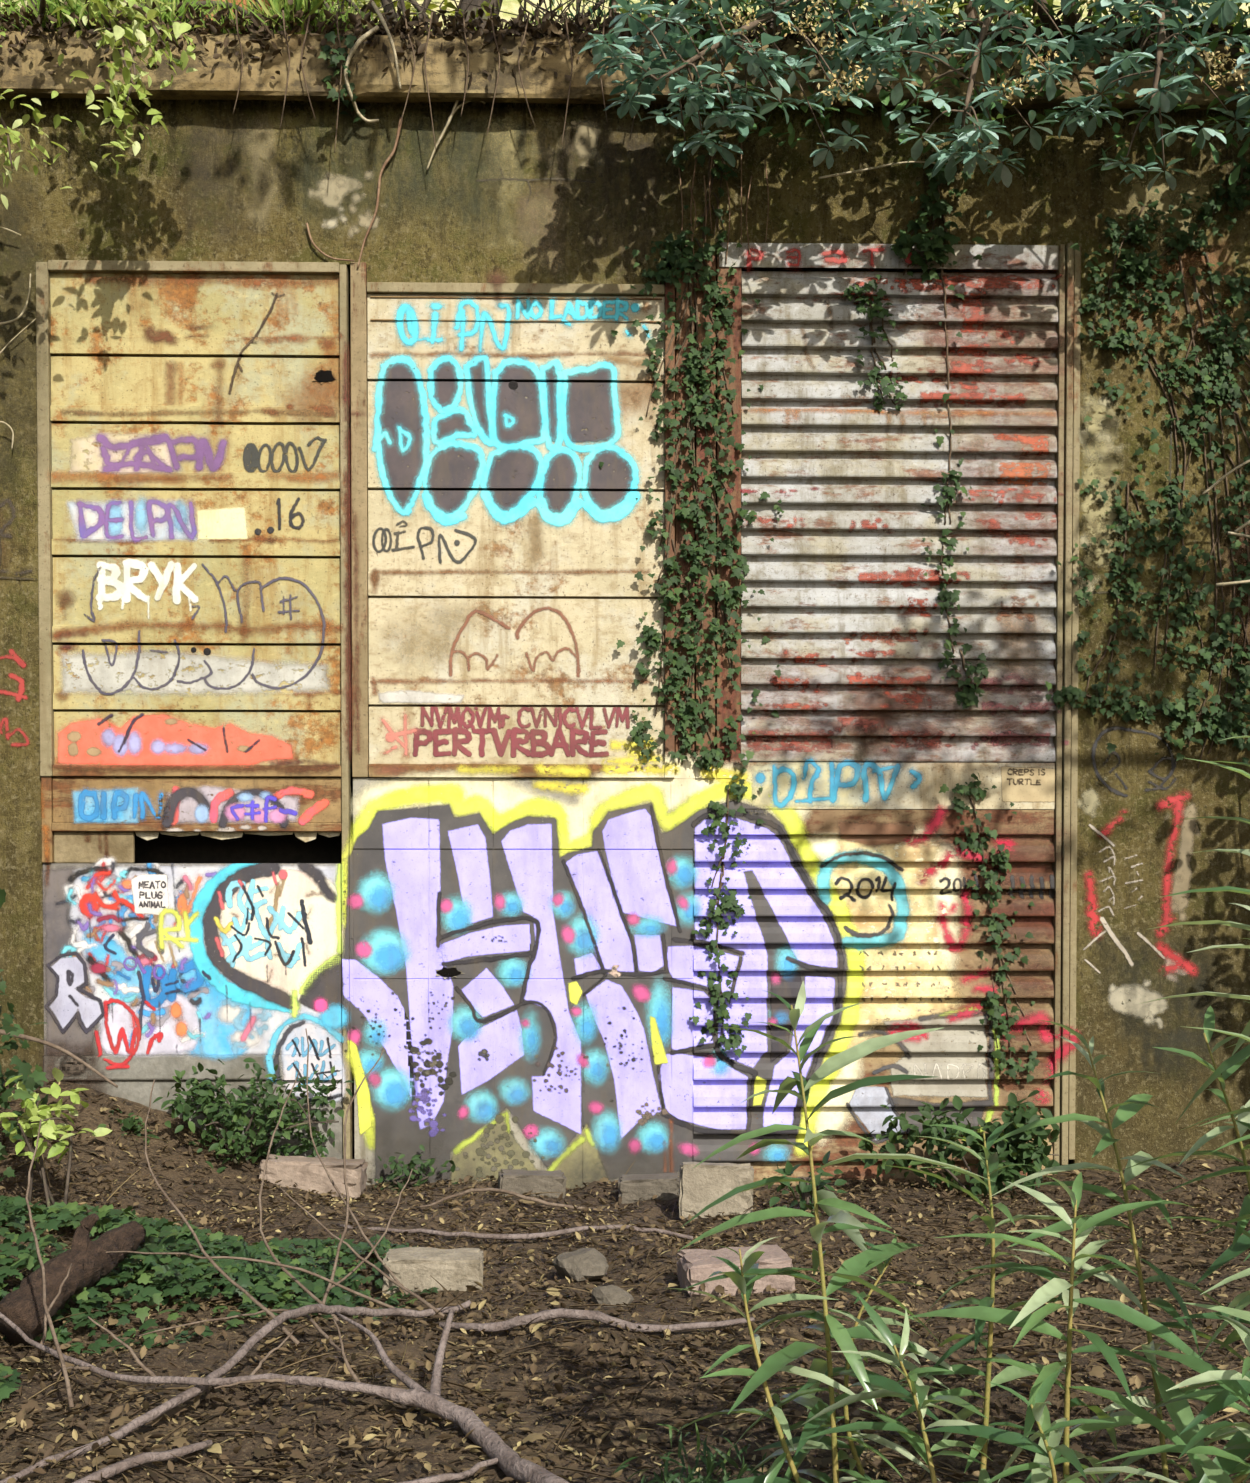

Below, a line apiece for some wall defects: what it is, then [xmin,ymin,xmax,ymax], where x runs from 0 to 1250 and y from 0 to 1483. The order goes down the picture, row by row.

spalling [309,171,378,237]
leakage [0,208,30,478]
corrosion [145,327,204,343]
corrosion [89,271,338,306]
peeling [776,269,1062,407]
spalling [134,294,369,864]
corrosion [52,334,660,774]
peeling [737,567,970,763]
peeling [849,518,891,533]
peeling [989,595,1039,622]
peeling [967,674,1069,750]
corrosion [1001,844,1050,1075]